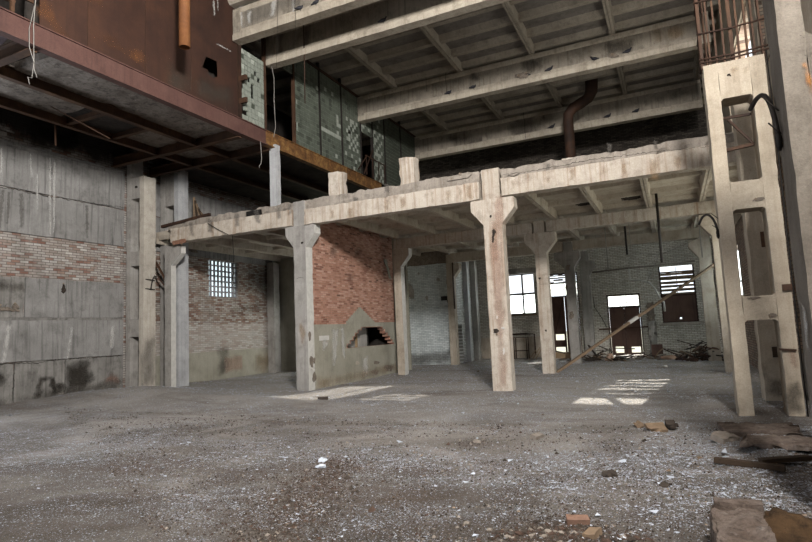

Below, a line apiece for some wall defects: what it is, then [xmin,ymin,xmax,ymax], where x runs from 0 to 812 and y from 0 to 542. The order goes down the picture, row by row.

damp [36,362,115,396]